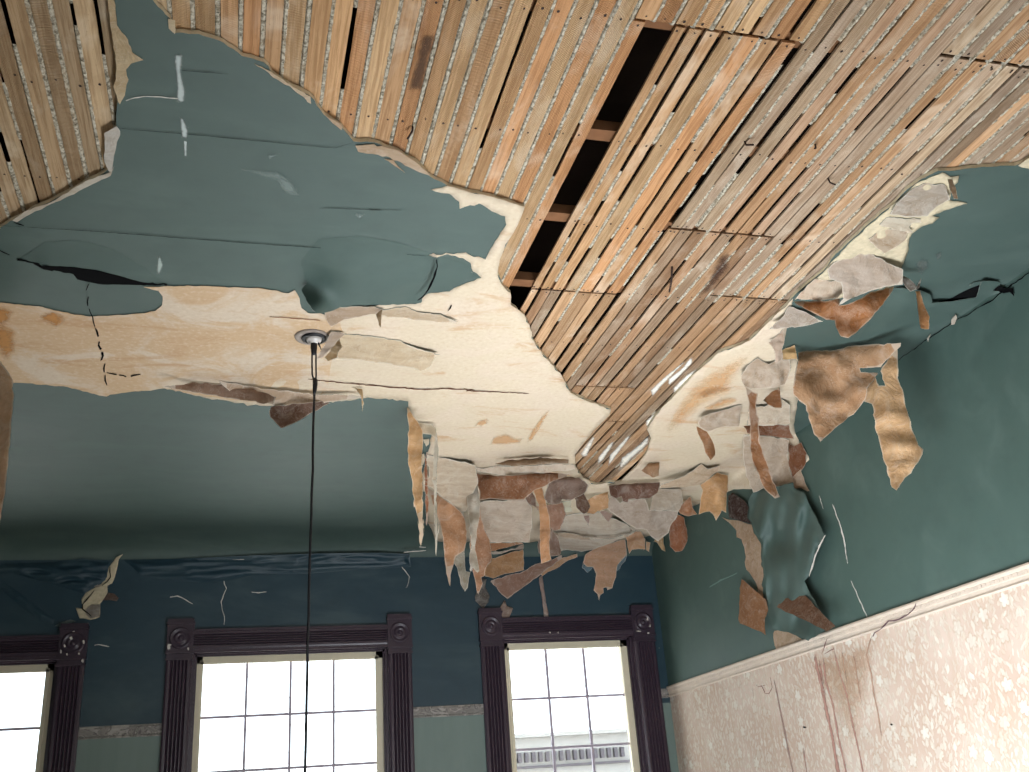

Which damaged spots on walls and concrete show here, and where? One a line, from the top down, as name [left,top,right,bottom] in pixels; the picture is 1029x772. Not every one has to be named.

flaking render [104,126,120,174]
flaking render [816,173,967,281]
crack [86,284,140,385]
flaking render [0,185,799,543]
crack [898,273,1028,361]
flaking render [76,554,123,620]
damp [774,682,807,772]
damp [814,640,881,772]